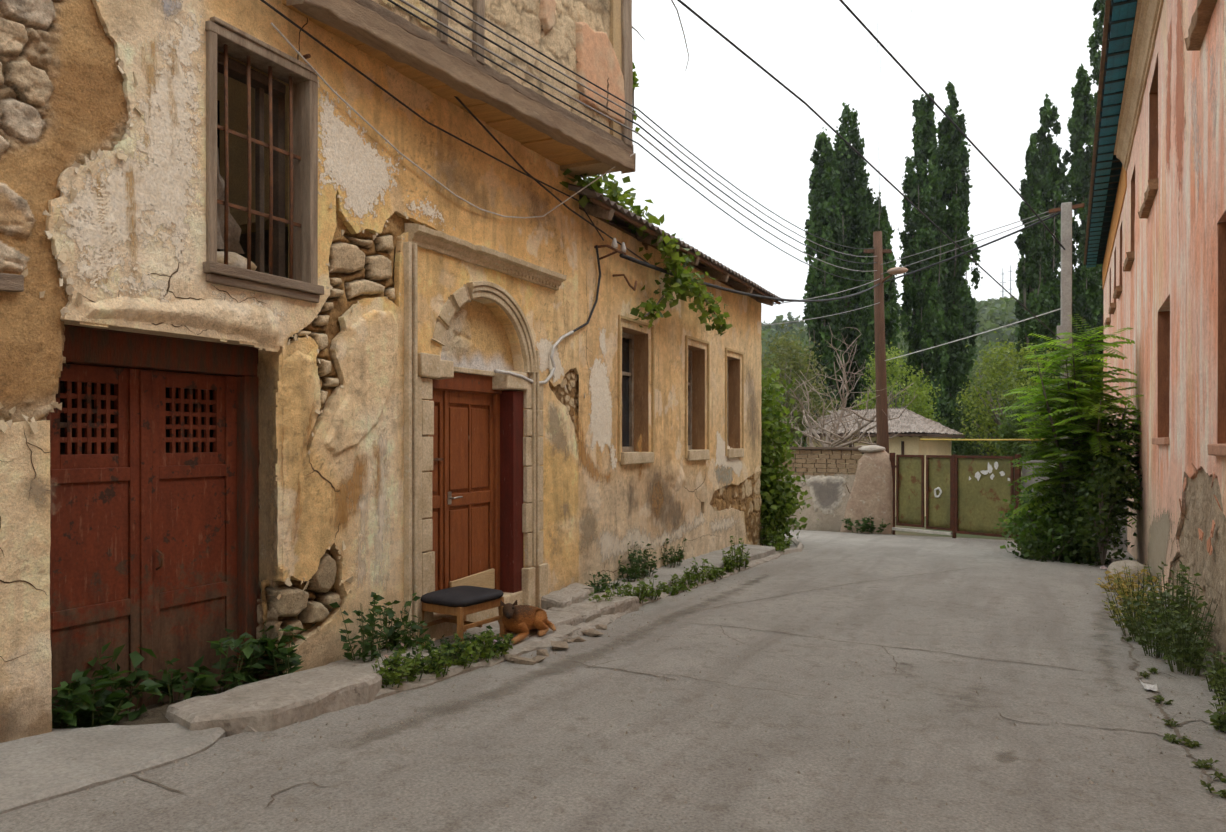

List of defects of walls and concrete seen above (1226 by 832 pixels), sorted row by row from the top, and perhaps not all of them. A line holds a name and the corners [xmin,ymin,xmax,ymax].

spalling [0,0,205,434]
spalling [287,80,455,417]
crack [0,517,47,595]
crack [0,426,51,500]
spalling [256,541,353,680]
peeling [536,327,617,470]
spalling [710,431,762,546]
spalling [1147,463,1226,673]